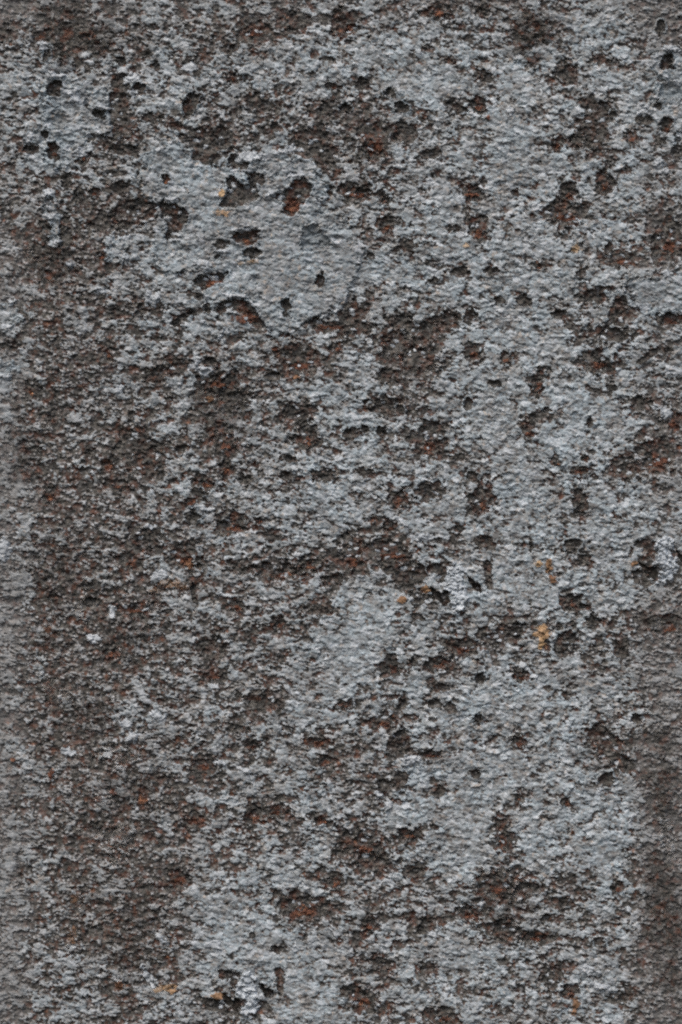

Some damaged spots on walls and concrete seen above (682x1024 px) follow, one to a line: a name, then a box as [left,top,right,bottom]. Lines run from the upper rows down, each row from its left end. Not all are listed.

corrosion [215,172,313,217]
corrosion [288,97,425,256]
corrosion [448,183,495,247]
corrosion [213,299,265,328]
corrosion [579,285,628,378]
corrosion [144,353,256,491]
corrosion [387,419,448,510]
corrosion [520,365,552,441]
corrosion [101,527,204,664]
corrosion [374,559,590,678]
corrosion [270,871,347,928]
corrosion [454,873,557,944]